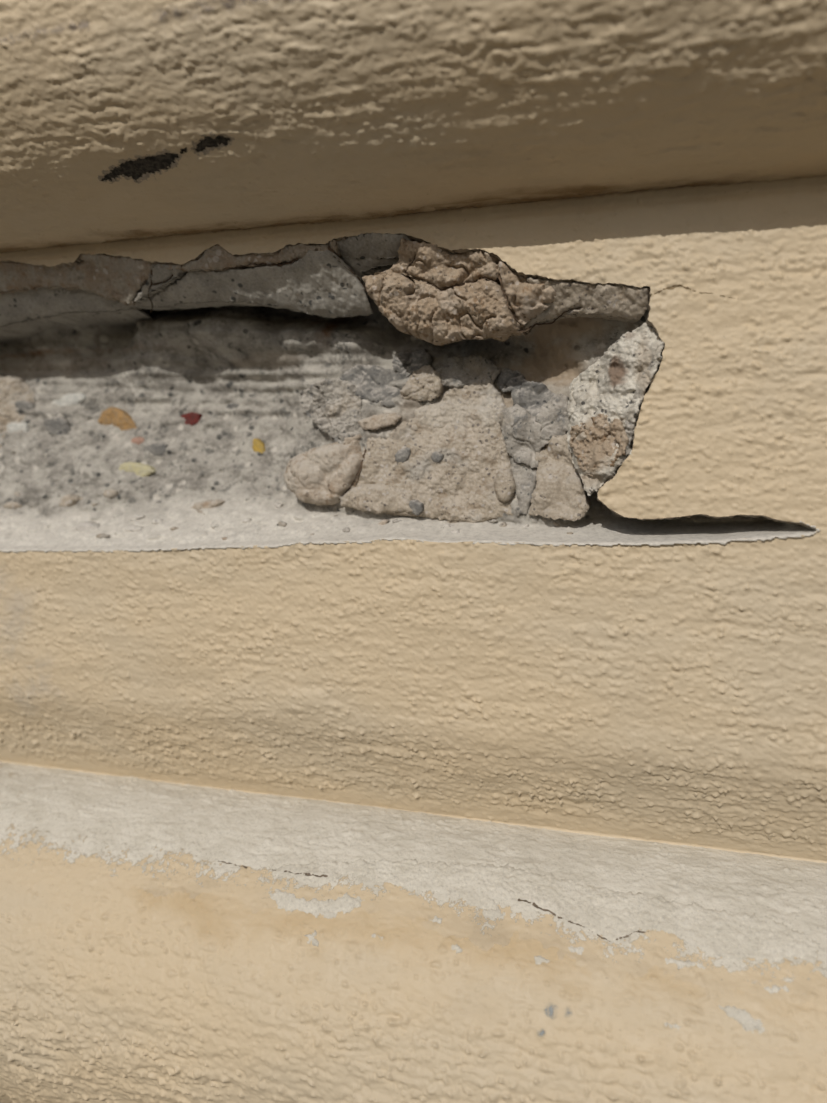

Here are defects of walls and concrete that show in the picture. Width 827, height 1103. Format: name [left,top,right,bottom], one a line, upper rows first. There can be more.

spalling [0,232,821,553]
peeling [269,888,364,947]
crack [518,898,649,942]